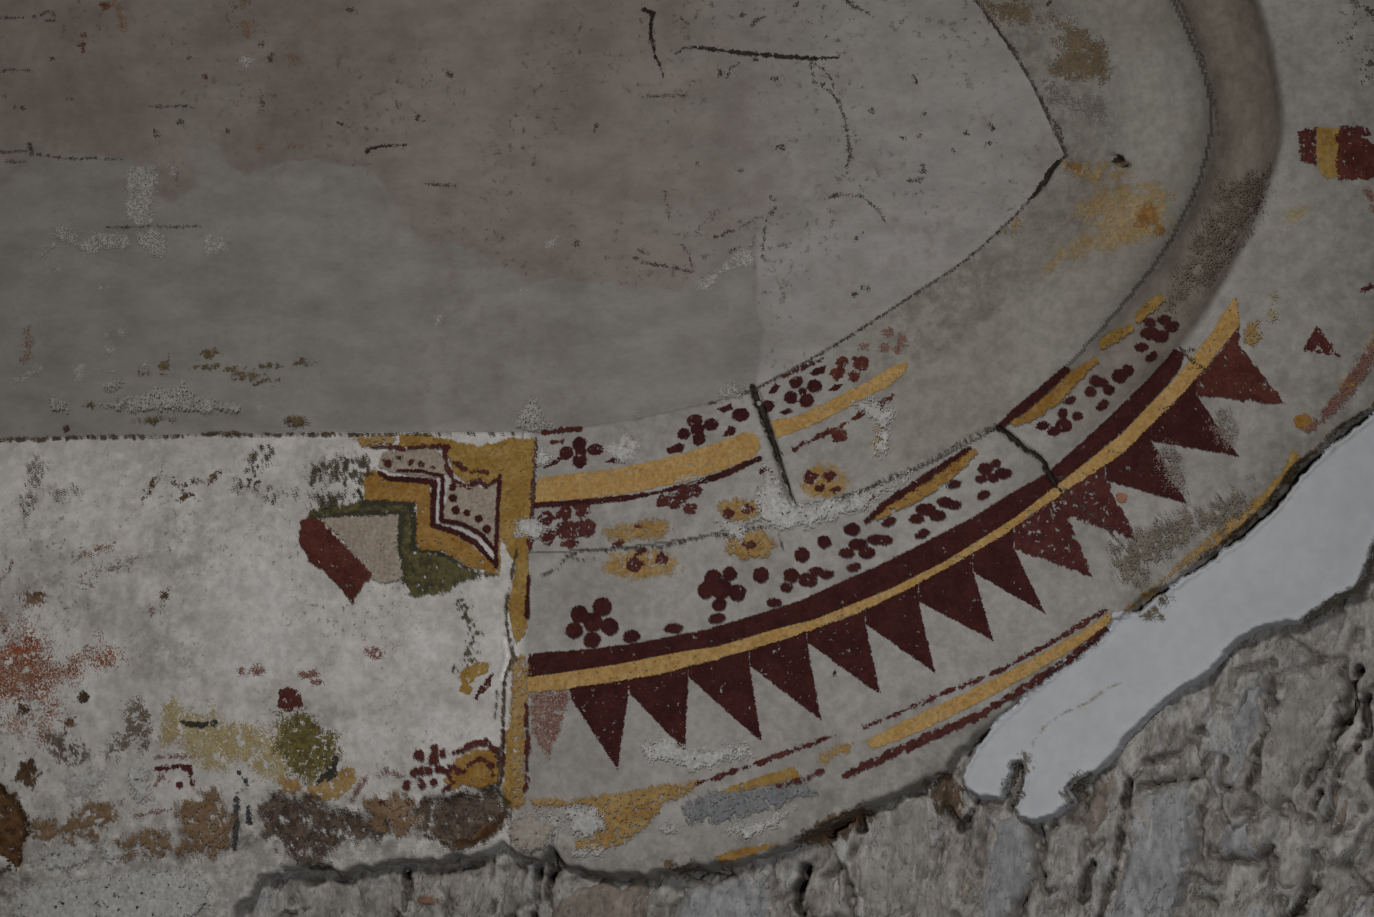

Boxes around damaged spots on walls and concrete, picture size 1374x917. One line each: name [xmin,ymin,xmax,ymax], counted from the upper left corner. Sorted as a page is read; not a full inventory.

crack [835,424,1127,552]
spalling [1139,589,1175,620]
spalling [1295,539,1374,629]
spalling [639,736,757,774]
spalling [923,770,966,819]
spalling [1000,751,1035,806]
spalling [1058,769,1097,807]
spalling [255,779,616,878]
spalling [724,800,878,848]
spalling [661,858,711,879]